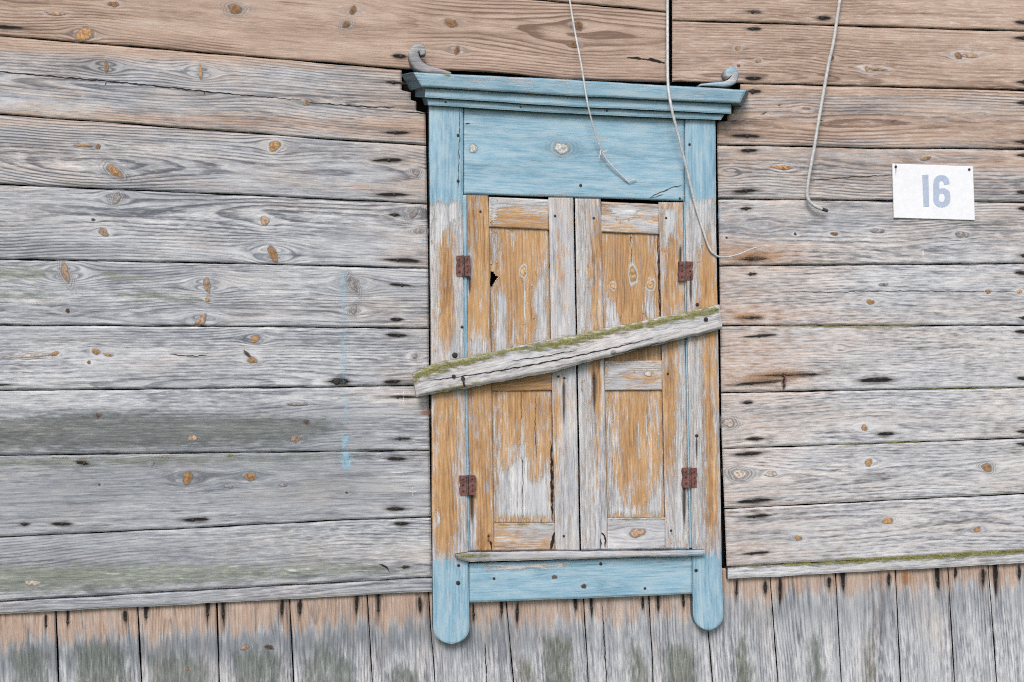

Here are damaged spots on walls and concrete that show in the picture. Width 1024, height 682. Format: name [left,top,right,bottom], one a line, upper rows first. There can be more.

peeling [431,200,460,359]
peeling [456,199,550,356]
peeling [575,202,589,335]
peeling [603,286,621,328]
peeling [606,204,642,222]
peeling [642,285,657,320]
peeling [660,197,715,310]
peeling [493,406,555,549]
peeling [581,380,606,548]
peeling [605,342,710,547]
water stain [205,602,226,625]